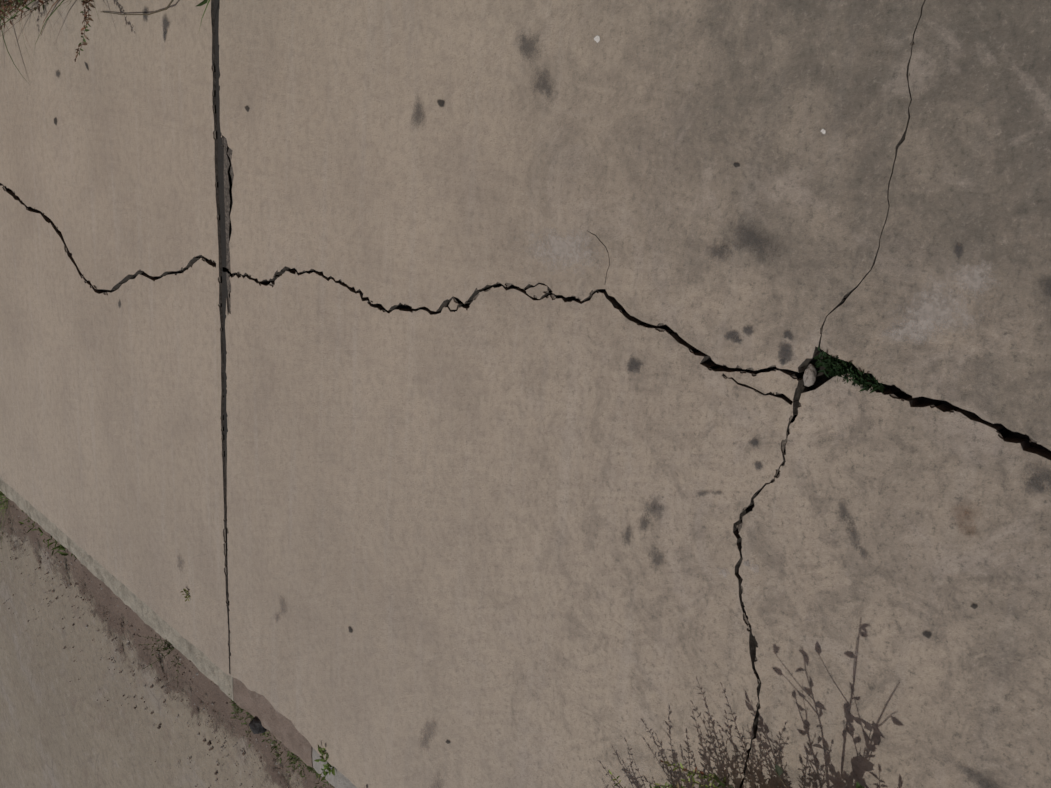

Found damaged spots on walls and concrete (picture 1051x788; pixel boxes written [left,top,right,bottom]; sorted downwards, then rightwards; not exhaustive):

crack [0,183,216,295]
crack [230,0,1051,788]